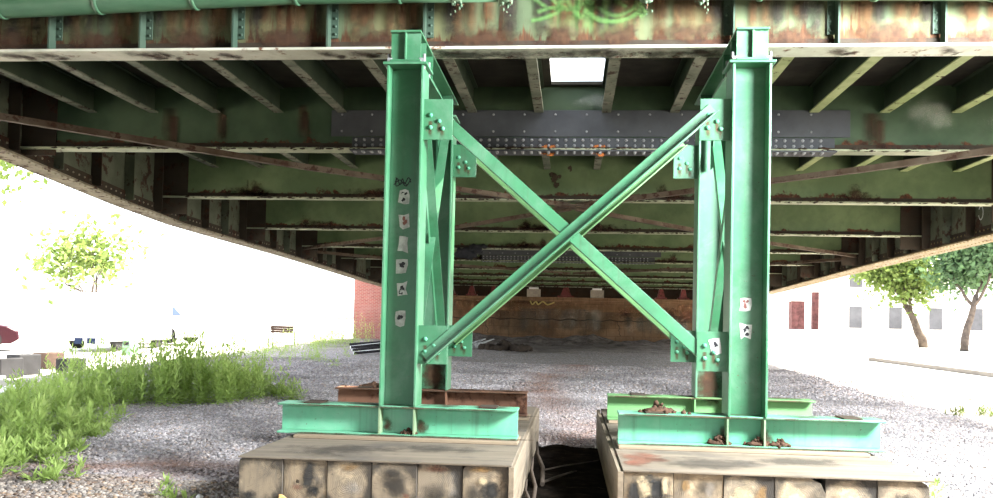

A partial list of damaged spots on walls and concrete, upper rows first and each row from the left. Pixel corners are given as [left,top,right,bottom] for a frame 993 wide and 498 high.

corrosion [0,17,68,60]
corrosion [65,13,131,49]
corrosion [128,8,227,60]
corrosion [253,4,321,47]
corrosion [440,0,518,55]
corrosion [536,0,640,58]
corrosion [654,0,723,57]
corrosion [750,0,824,44]
corrosion [855,1,932,43]
corrosion [290,346,524,411]
corrosion [624,352,886,453]
corrosion [360,420,523,441]